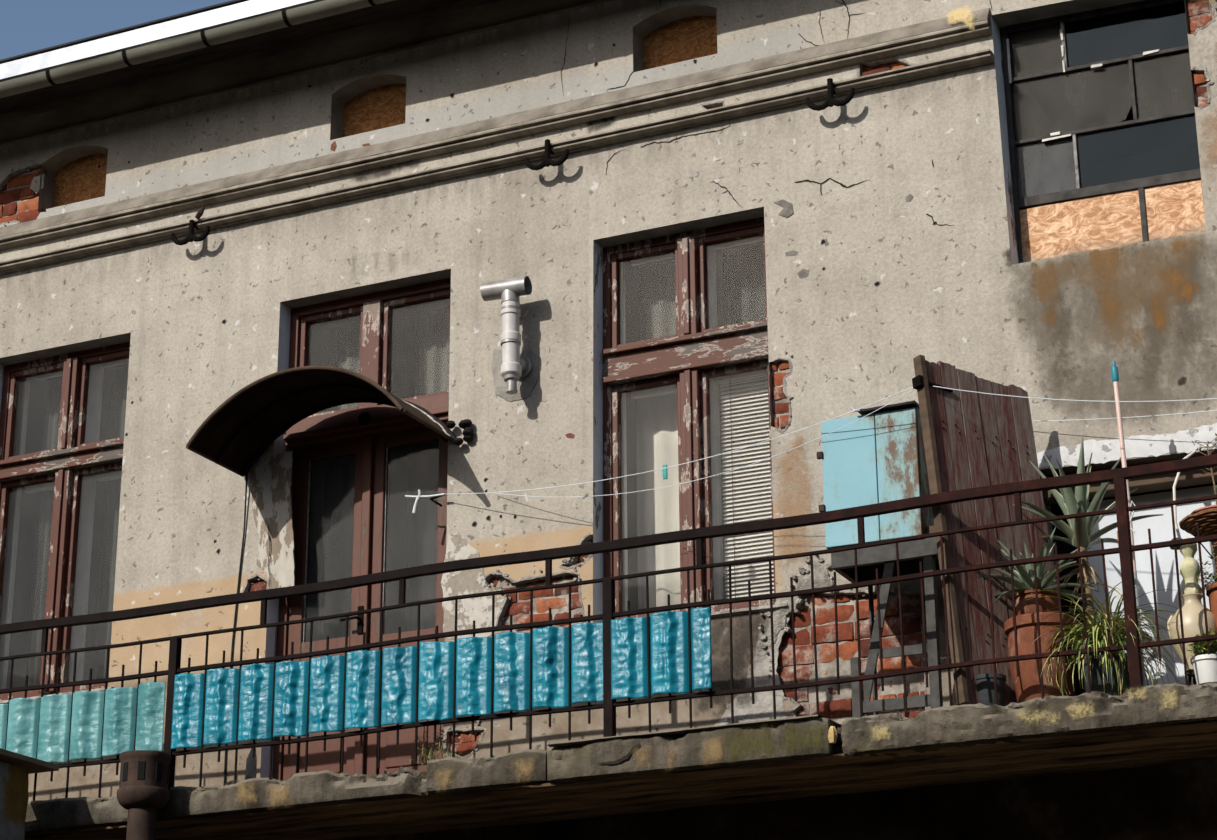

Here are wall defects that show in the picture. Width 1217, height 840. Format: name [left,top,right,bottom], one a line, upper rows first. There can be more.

spalling [1186,0,1216,35]
spalling [1193,66,1214,110]
crack [606,122,730,170]
spalling [0,161,47,226]
crack [795,178,867,196]
leakage [1019,242,1217,417]
peeling [242,451,295,593]
spalling [441,514,594,639]
spalling [758,555,930,725]